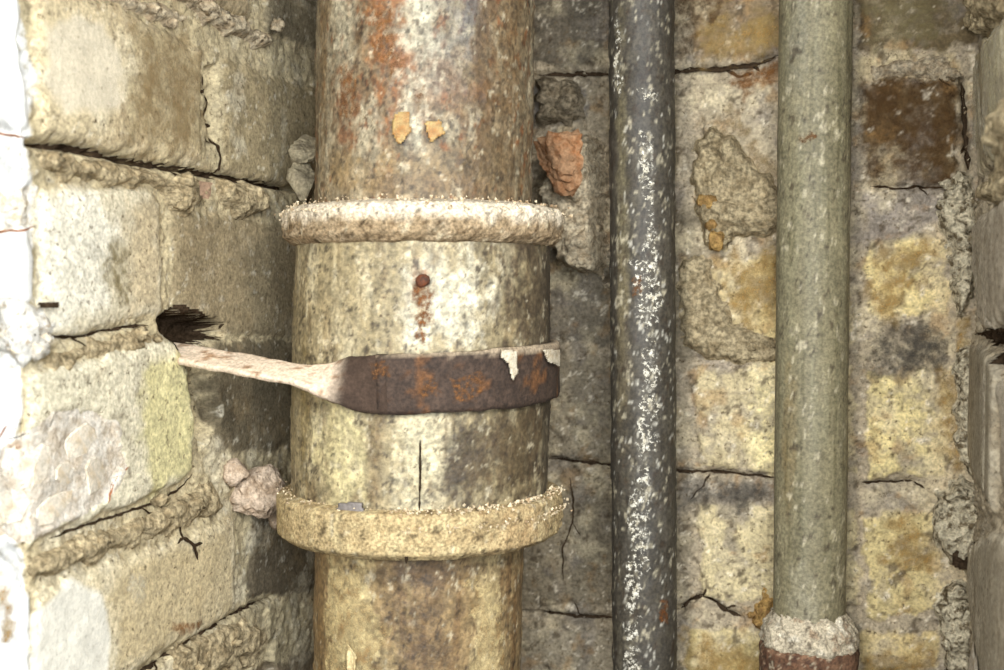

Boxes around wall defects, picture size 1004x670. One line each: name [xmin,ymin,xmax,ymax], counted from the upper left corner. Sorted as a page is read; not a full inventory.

crack [0,76,280,191]
crack [975,327,1001,336]